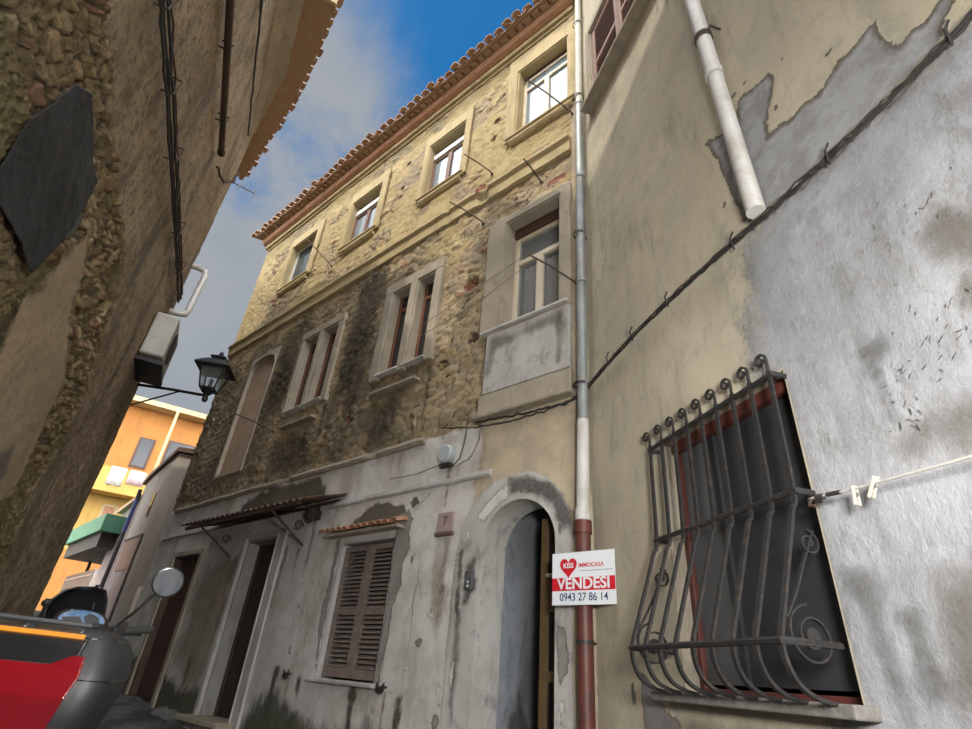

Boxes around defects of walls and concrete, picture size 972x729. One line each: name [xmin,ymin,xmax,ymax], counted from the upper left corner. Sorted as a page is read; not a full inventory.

peeling [705,0,972,729]
damp [243,666,315,729]
damp [346,686,356,729]
damp [392,697,401,729]